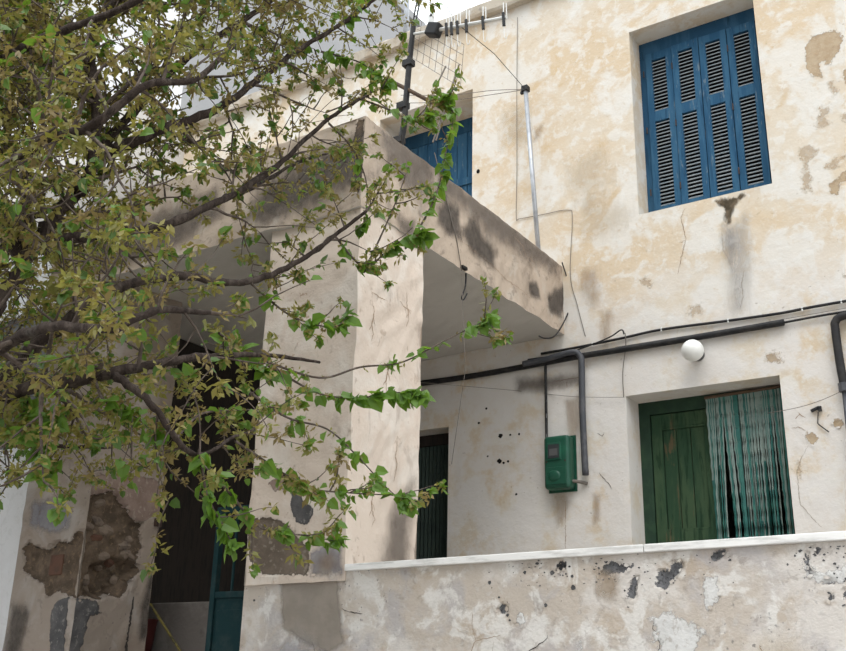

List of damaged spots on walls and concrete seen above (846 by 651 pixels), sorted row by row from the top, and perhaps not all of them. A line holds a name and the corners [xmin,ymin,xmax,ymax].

peeling [805,30,844,95]
peeling [799,146,816,189]
peeling [824,157,846,195]
water stain [439,181,557,268]
water stain [716,194,744,224]
water stain [529,283,564,315]
spalling [22,473,160,602]
spalling [247,517,342,576]
spalling [513,560,585,590]
spalling [582,554,685,608]
peeling [787,545,846,606]